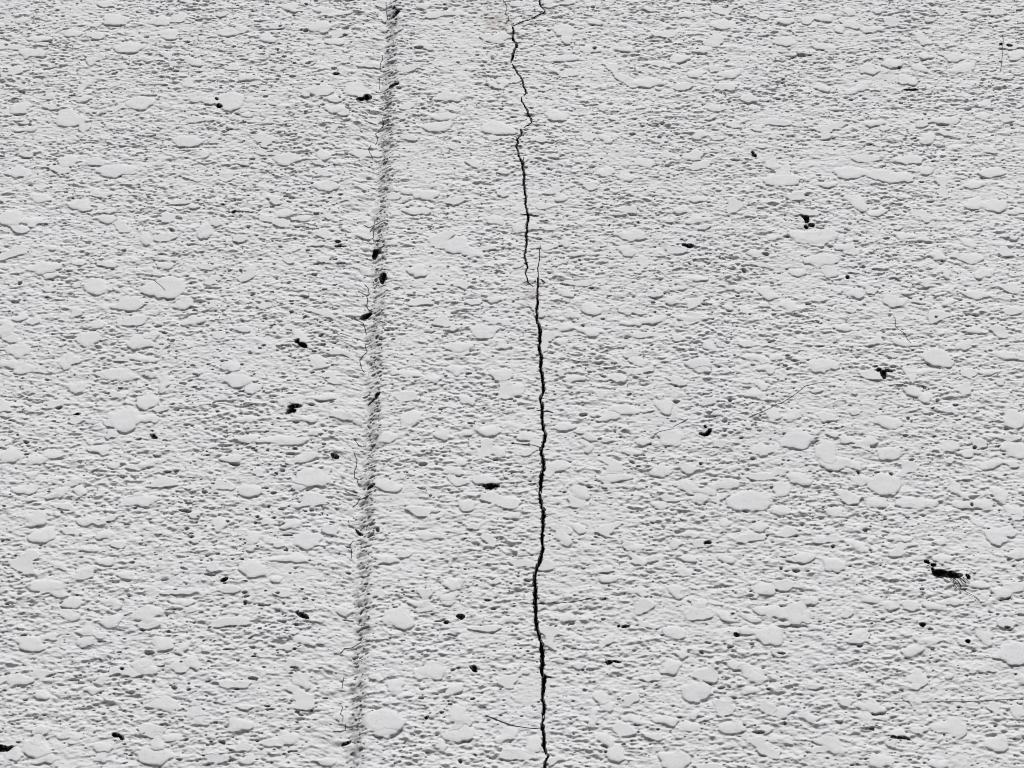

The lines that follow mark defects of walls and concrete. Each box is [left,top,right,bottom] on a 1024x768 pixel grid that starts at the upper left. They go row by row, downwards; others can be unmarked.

crack [485,0,592,768]